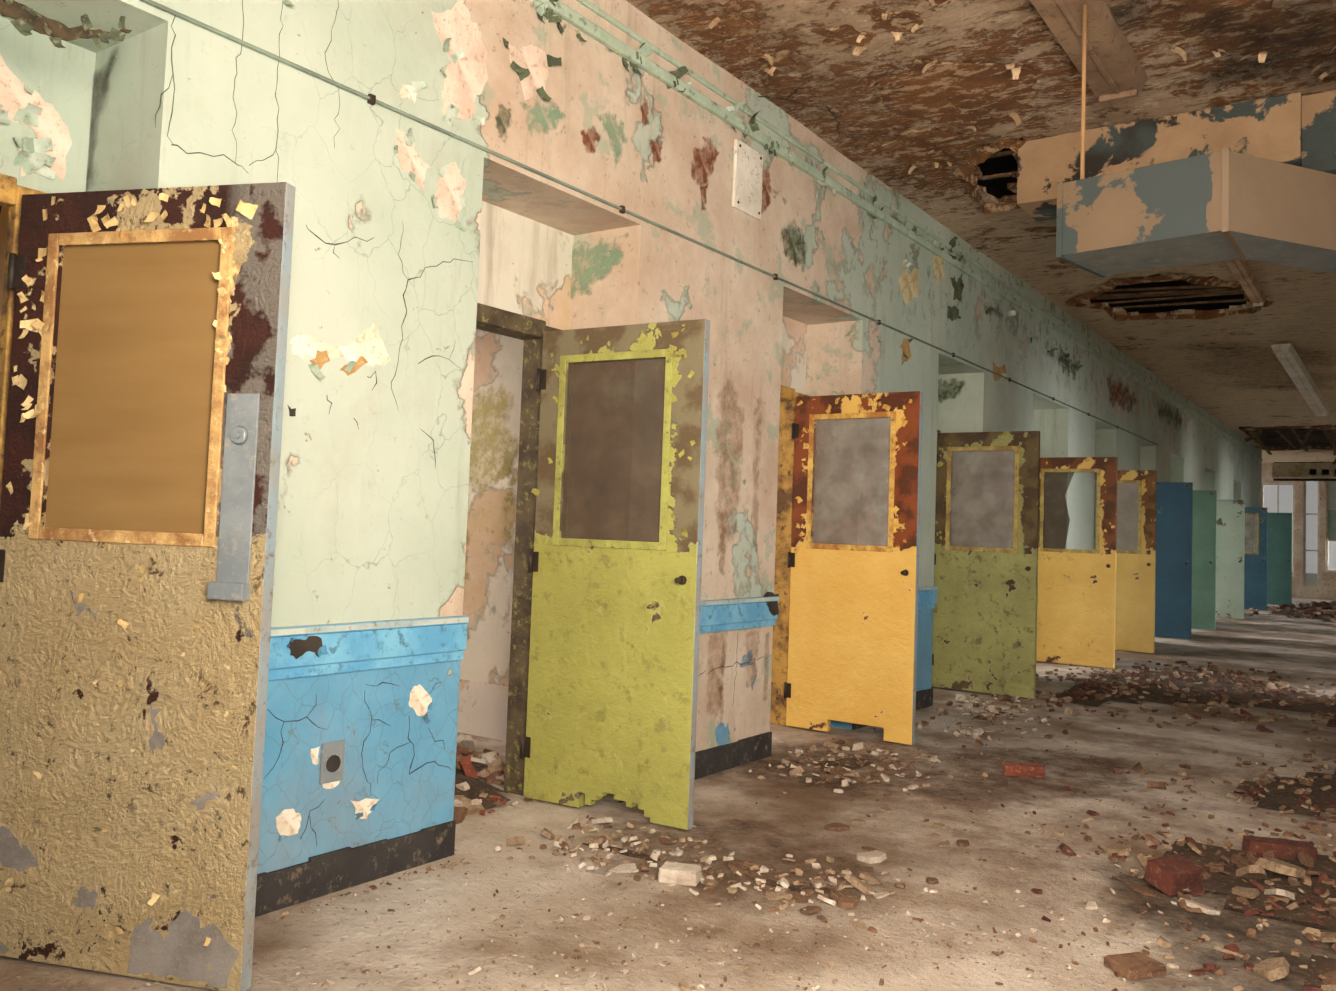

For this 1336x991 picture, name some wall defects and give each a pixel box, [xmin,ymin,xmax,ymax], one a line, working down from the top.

peeling [0,54,72,180]
peeling [0,0,132,50]
crack [155,0,283,180]
crack [325,2,340,148]
peeling [503,38,562,102]
water stain [1200,0,1336,82]
crack [306,221,471,466]
peeling [287,636,328,659]
crack [266,694,324,776]
crack [361,682,452,789]
spalling [409,684,433,724]
spalling [276,809,301,842]